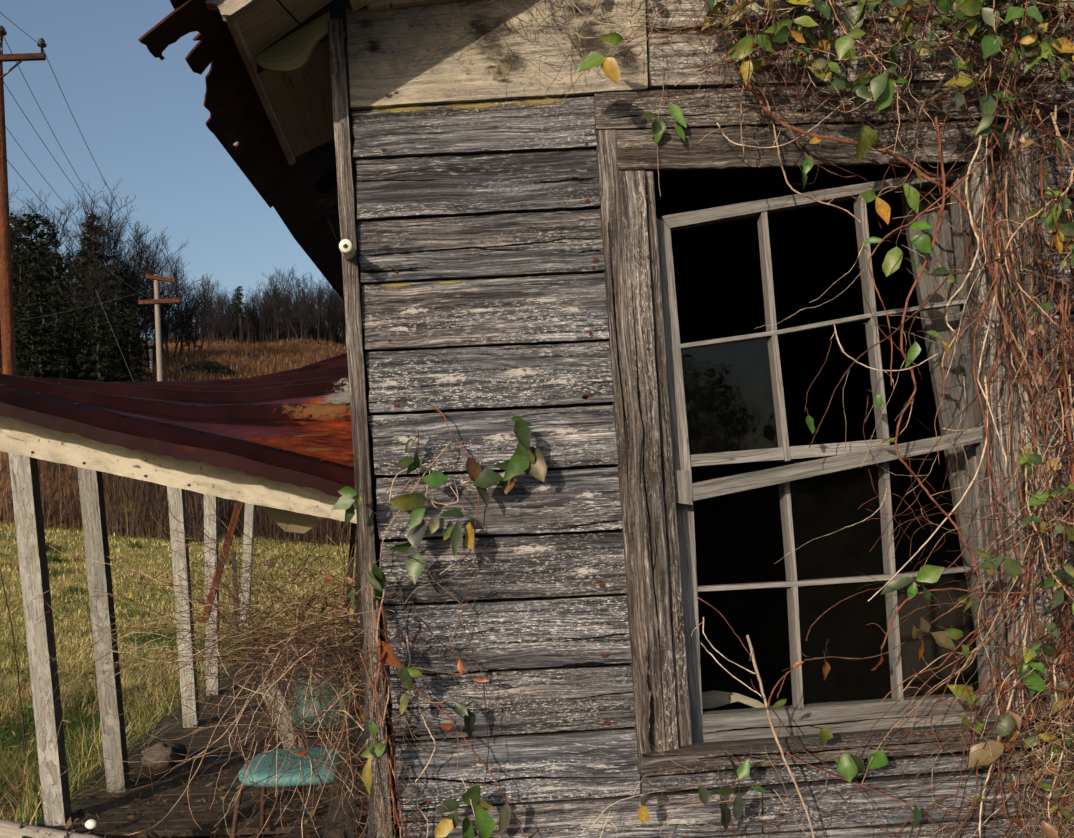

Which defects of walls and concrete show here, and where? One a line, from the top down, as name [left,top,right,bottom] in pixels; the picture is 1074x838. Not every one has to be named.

water stain [470,17,523,69]
corrosion [248,396,354,467]